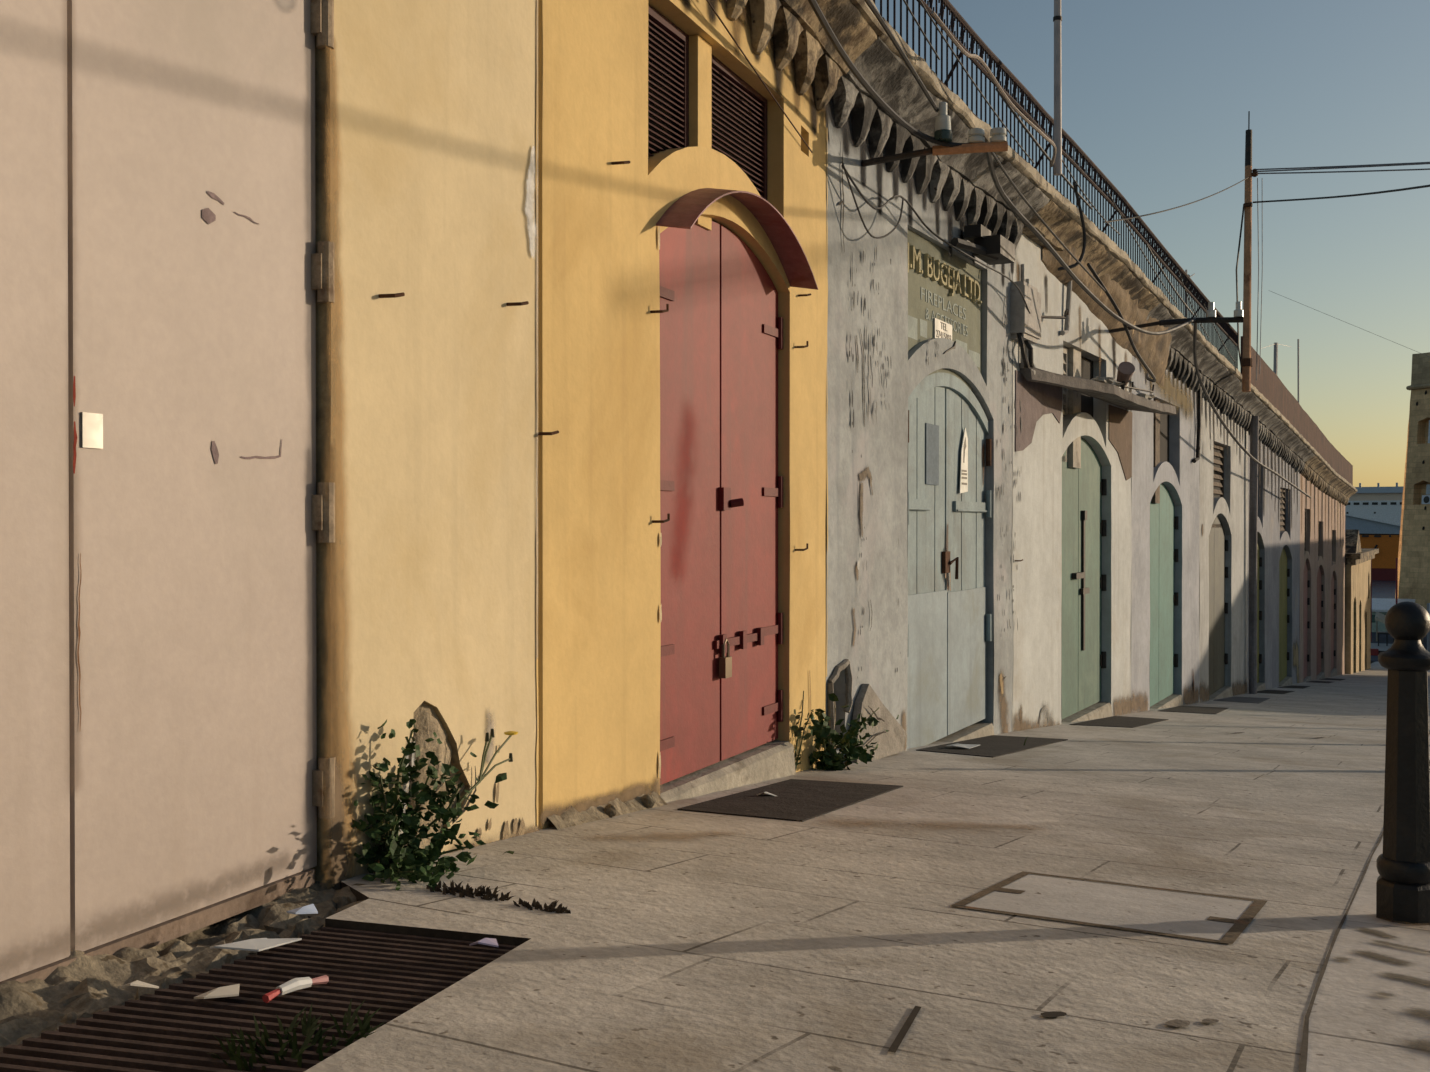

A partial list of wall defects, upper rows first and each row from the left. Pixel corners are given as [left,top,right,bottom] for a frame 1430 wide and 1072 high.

peeling [856,467,873,580]